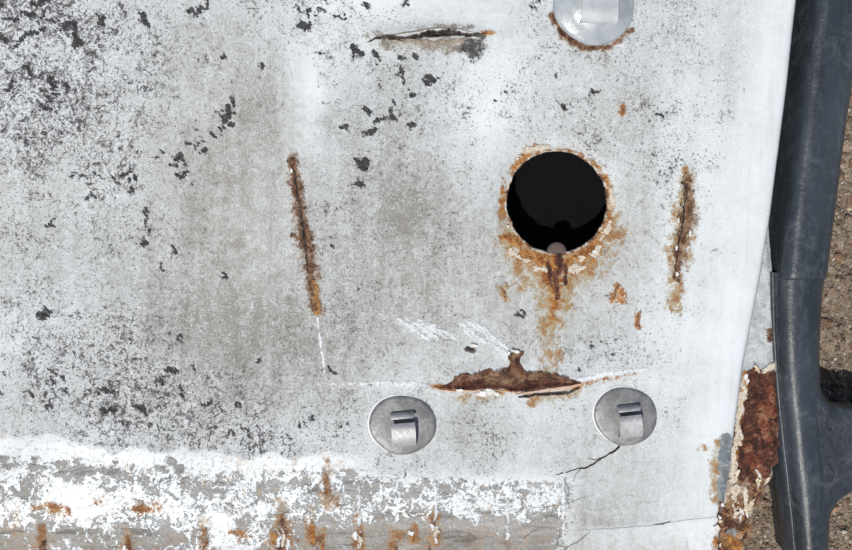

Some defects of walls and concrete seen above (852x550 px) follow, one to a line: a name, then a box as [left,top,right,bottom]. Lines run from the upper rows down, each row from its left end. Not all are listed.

crack [365,24,487,65]
rust [548,12,634,52]
rust [286,153,325,316]
rust [494,143,628,375]
rust [664,166,701,316]
peeling [0,456,47,472]
peeling [69,465,126,478]
peeling [164,457,187,474]
crack [556,446,620,482]
rust [711,368,779,550]
rust [28,502,71,517]
rust [265,498,326,550]